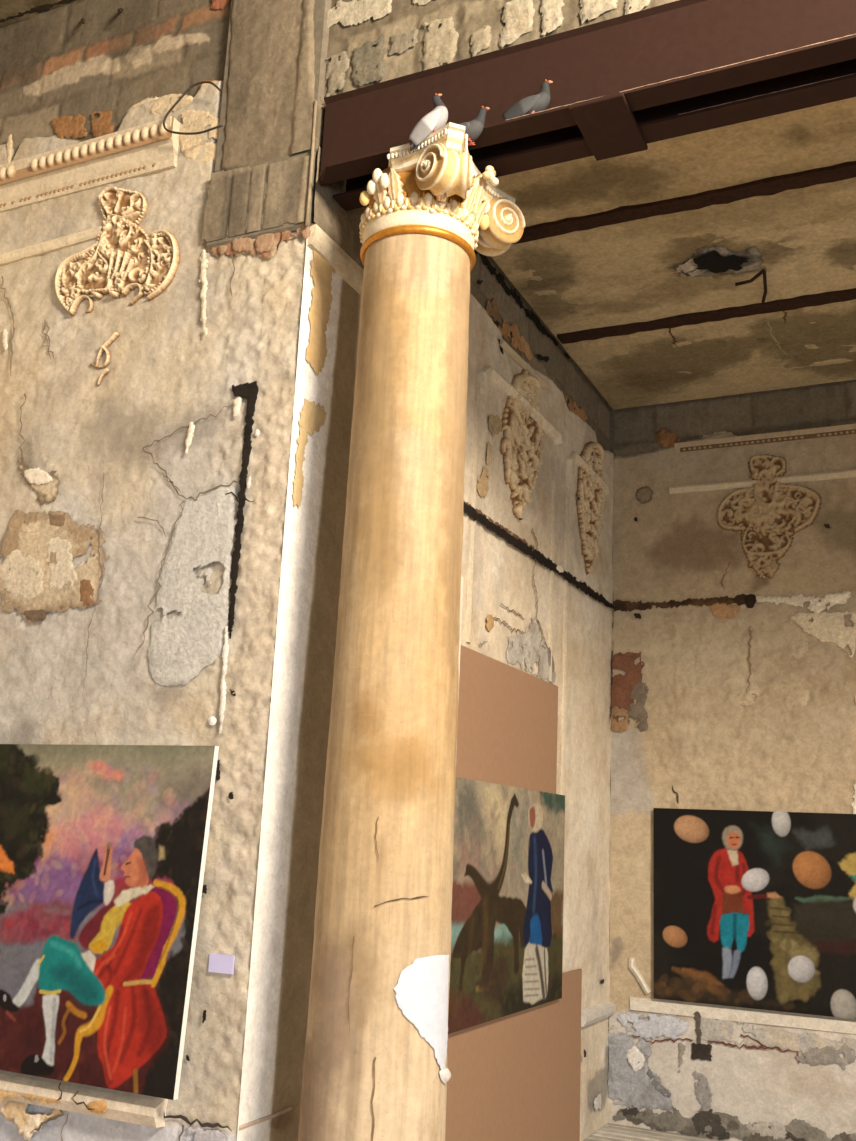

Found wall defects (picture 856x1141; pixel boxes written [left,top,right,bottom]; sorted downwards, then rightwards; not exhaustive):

peeling [199,222,336,376]
peeling [292,398,327,508]
flaking render [0,457,110,623]
crack [82,473,104,695]
crack [131,405,238,663]
peeling [710,590,856,658]
flaking render [611,652,649,733]
flaking render [0,1090,64,1140]
crack [164,1113,232,1141]
peeling [393,954,451,1084]
crack [607,1034,800,1094]
flaking render [594,1011,856,1141]